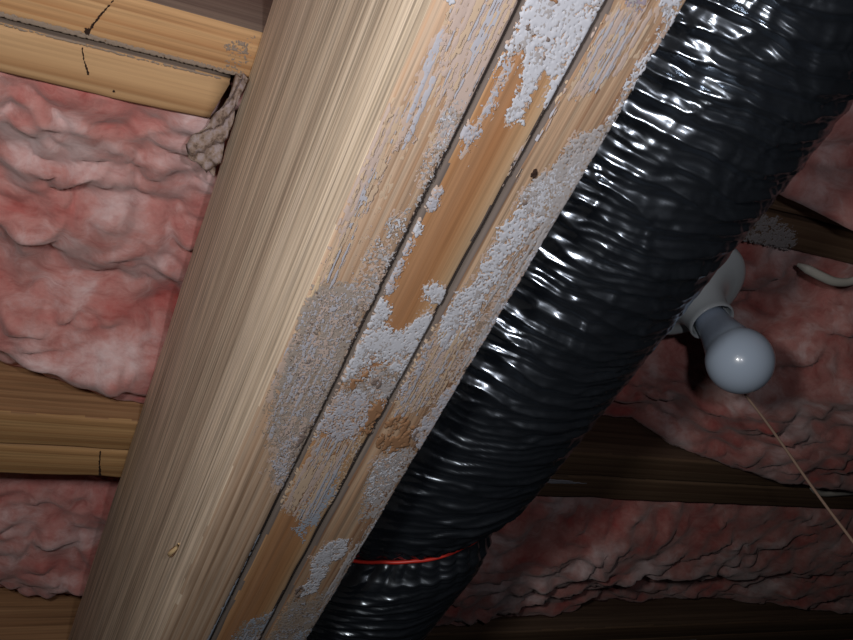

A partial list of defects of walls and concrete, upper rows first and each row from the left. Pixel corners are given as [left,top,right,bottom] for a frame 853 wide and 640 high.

leakage [230,0,681,640]